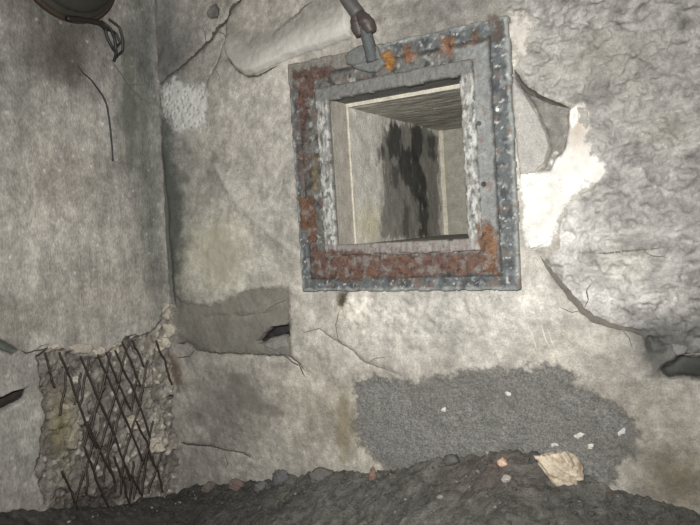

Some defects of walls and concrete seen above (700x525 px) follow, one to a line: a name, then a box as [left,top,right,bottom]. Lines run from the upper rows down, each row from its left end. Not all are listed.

crack [111,0,241,104]
corrosion [381,44,417,71]
corrosion [293,66,501,282]
leakage [381,119,442,241]
spalling [504,0,700,378]
spalling [262,325,290,350]
crack [304,312,402,376]
crack [540,256,653,362]
flaking render [35,303,180,509]